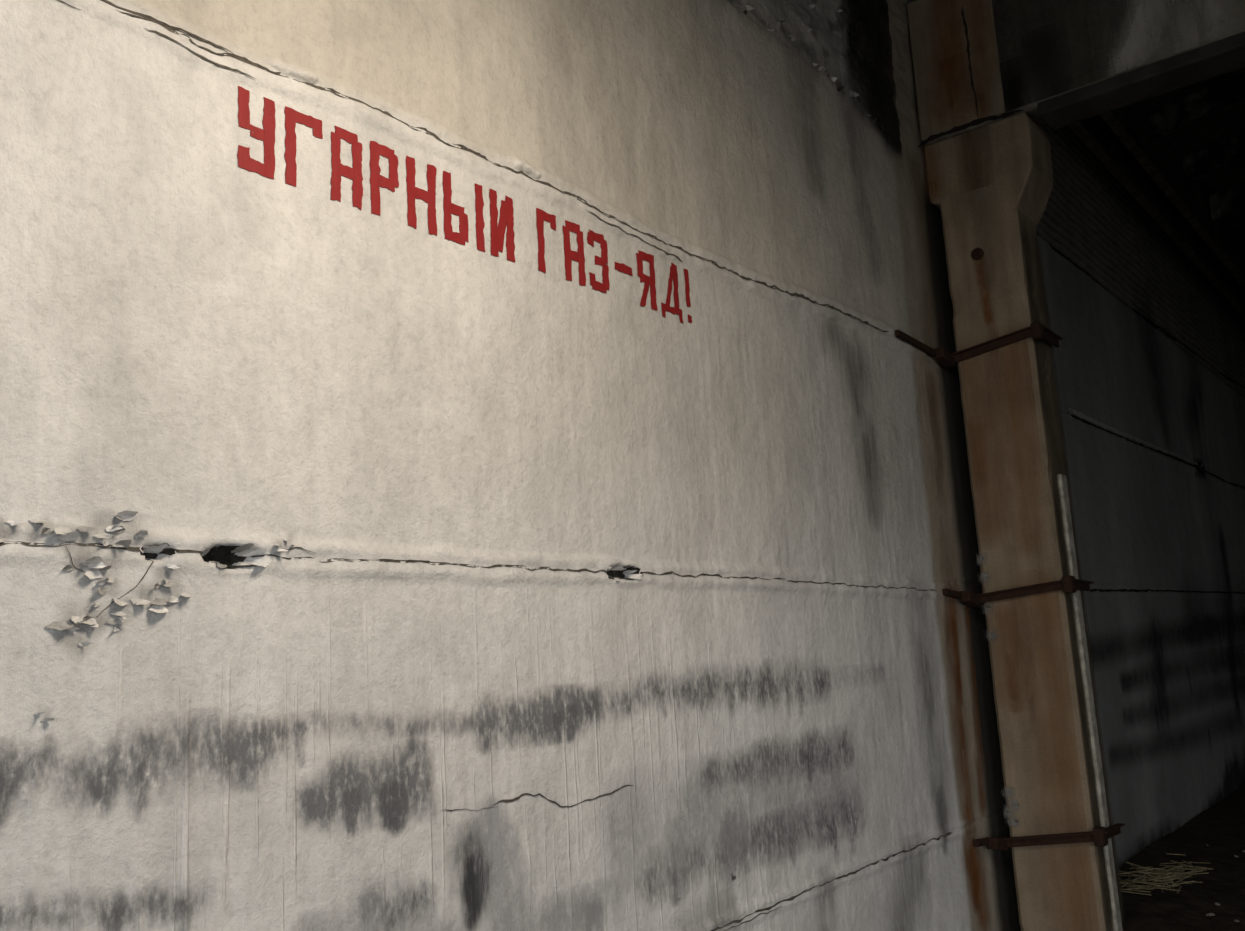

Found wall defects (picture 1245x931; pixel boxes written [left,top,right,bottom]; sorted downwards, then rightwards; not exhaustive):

crack [58,0,889,332]
flaking render [0,510,191,647]
crack [0,541,202,618]
crack [255,547,937,591]
water stain [464,670,826,749]
water stain [73,725,279,807]
water stain [300,728,430,831]
crack [447,785,634,811]
water stain [100,890,185,931]
water stain [463,802,530,931]
crack [711,832,952,931]
rust [965,841,986,926]